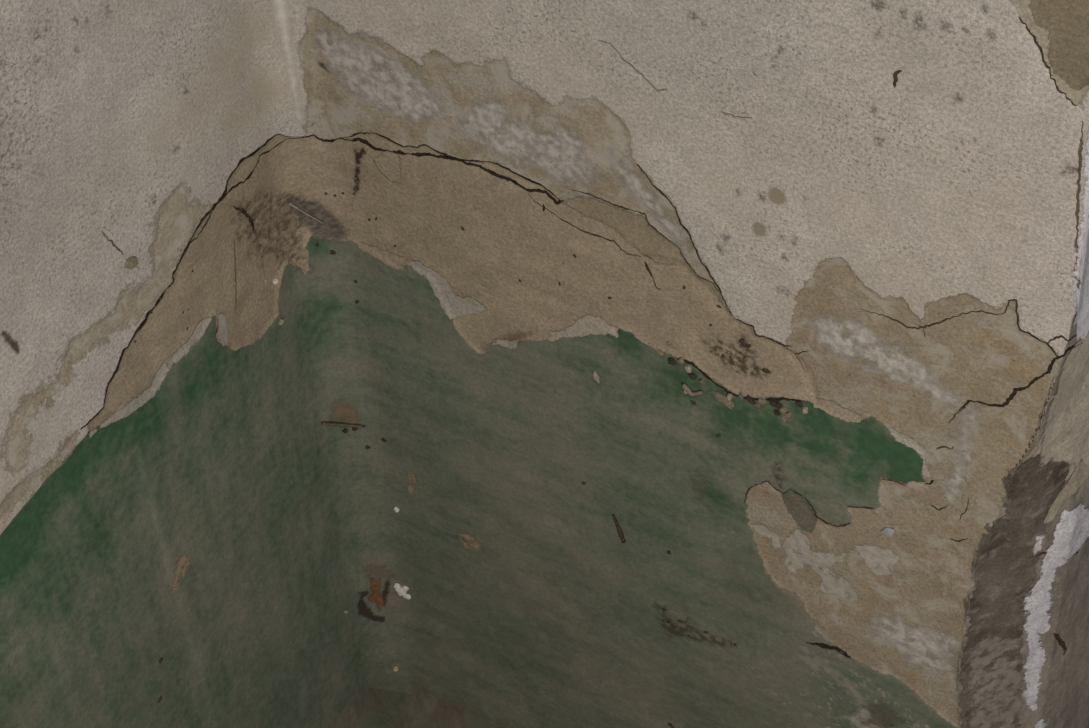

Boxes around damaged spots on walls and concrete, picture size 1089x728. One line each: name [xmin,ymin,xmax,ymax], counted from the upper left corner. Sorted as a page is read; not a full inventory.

flaking render [1010,0,1089,105]
crack [1019,16,1084,289]
spalling [0,8,820,472]
crack [80,132,809,430]
crack [861,299,1083,450]
peeling [0,431,79,518]
crack [744,480,874,527]
flaking render [745,258,1089,728]
crack [881,479,969,542]
corrosion [358,565,396,622]
peeling [394,583,411,600]